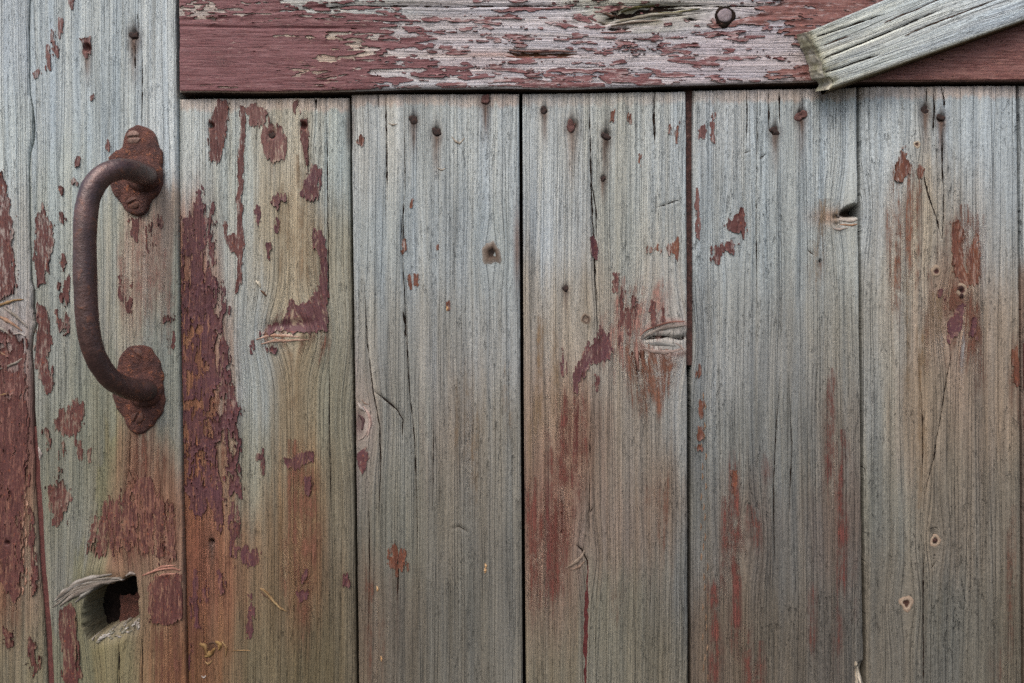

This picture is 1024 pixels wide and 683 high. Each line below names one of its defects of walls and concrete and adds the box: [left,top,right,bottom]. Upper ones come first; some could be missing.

peeling [32,0,75,79]
peeling [79,36,92,59]
peeling [866,24,1024,80]
peeling [0,169,19,301]
peeling [58,156,81,196]
crack [378,93,406,239]
peeling [86,0,883,644]
peeling [946,219,981,344]
peeling [0,202,92,604]
crack [364,264,434,630]
peeling [27,636,42,678]
peeling [187,593,255,678]